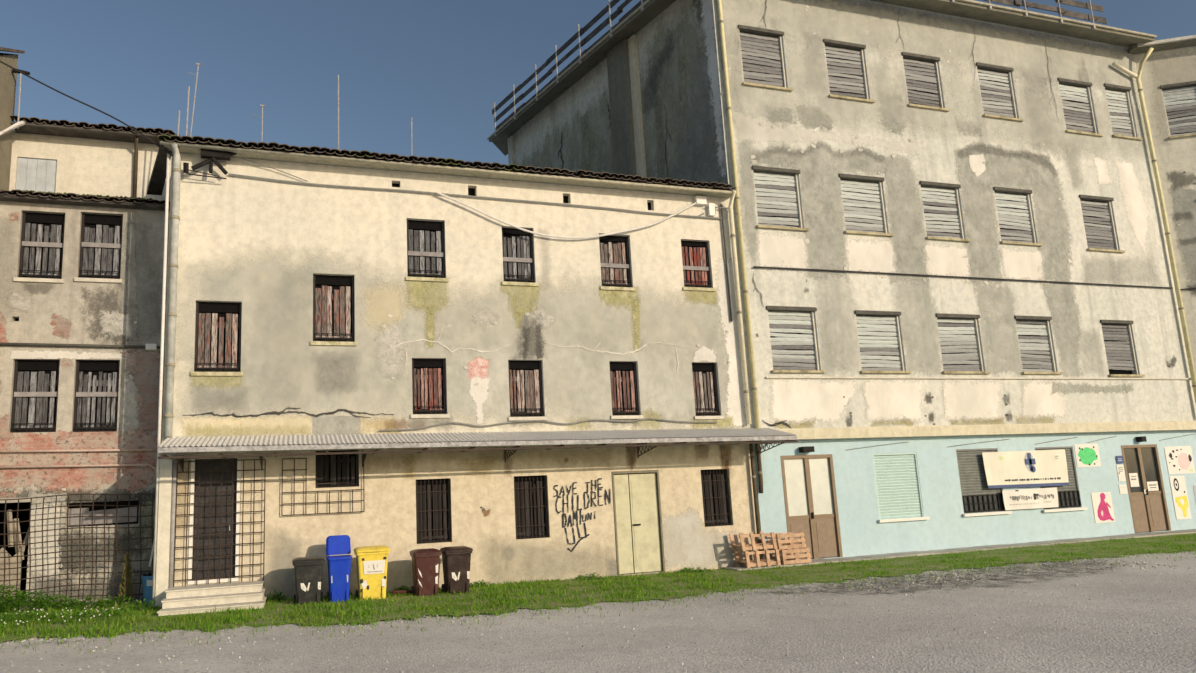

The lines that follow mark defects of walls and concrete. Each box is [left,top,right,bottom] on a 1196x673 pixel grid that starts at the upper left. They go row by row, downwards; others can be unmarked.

damp [644,22,721,183]
flaking render [0,291,165,597]
crack [182,407,394,418]
damp [182,255,730,436]